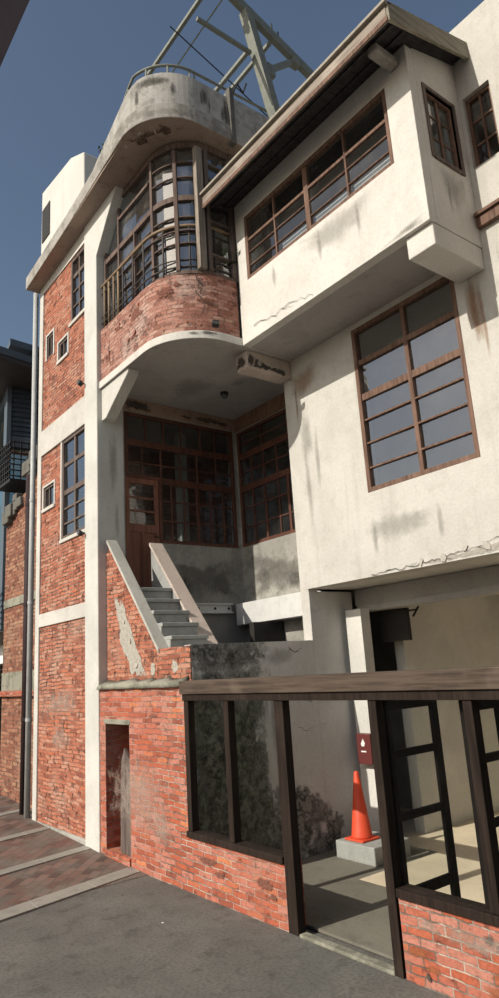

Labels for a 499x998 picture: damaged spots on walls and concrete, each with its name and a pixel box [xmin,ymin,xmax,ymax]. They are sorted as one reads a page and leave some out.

leakage [135,78,173,105]
crack [190,274,215,314]
crack [372,536,499,575]
leakage [181,566,230,592]
leakage [258,560,299,589]